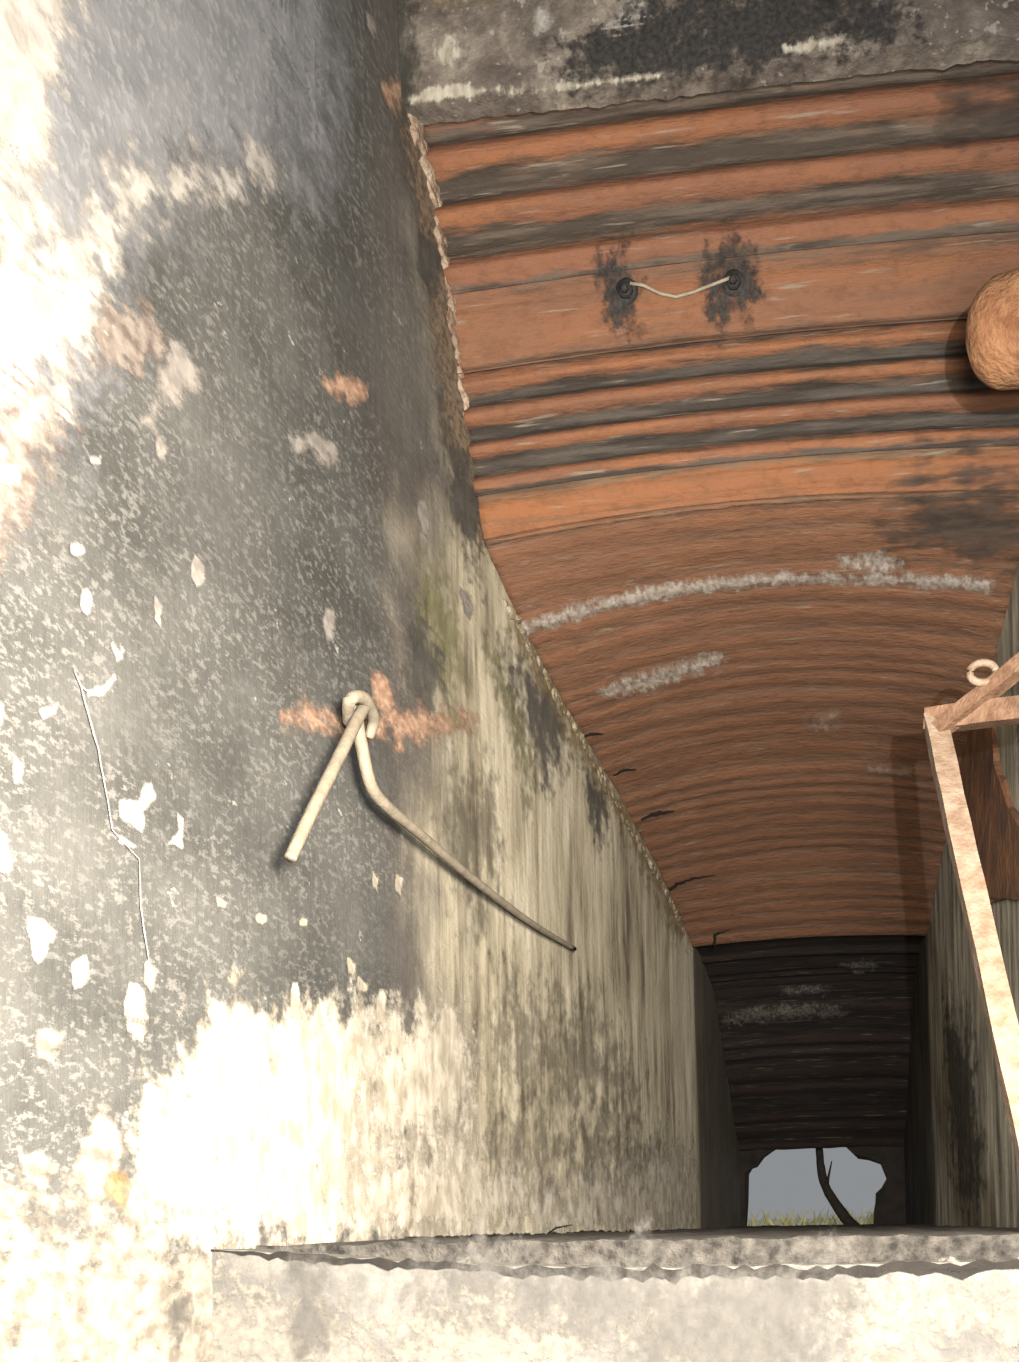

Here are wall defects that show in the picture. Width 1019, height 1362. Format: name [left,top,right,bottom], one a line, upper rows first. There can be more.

water stain [603,2,647,36]
peeling [0,0,353,569]
water stain [701,233,762,327]
corrosion [323,373,368,406]
water stain [521,443,1019,635]
water stain [601,652,722,697]
corrosion [280,703,346,734]
corrosion [364,672,478,751]
peeling [118,783,156,848]
peeling [27,917,55,963]
peeling [71,955,89,989]
peeling [124,958,697,1253]